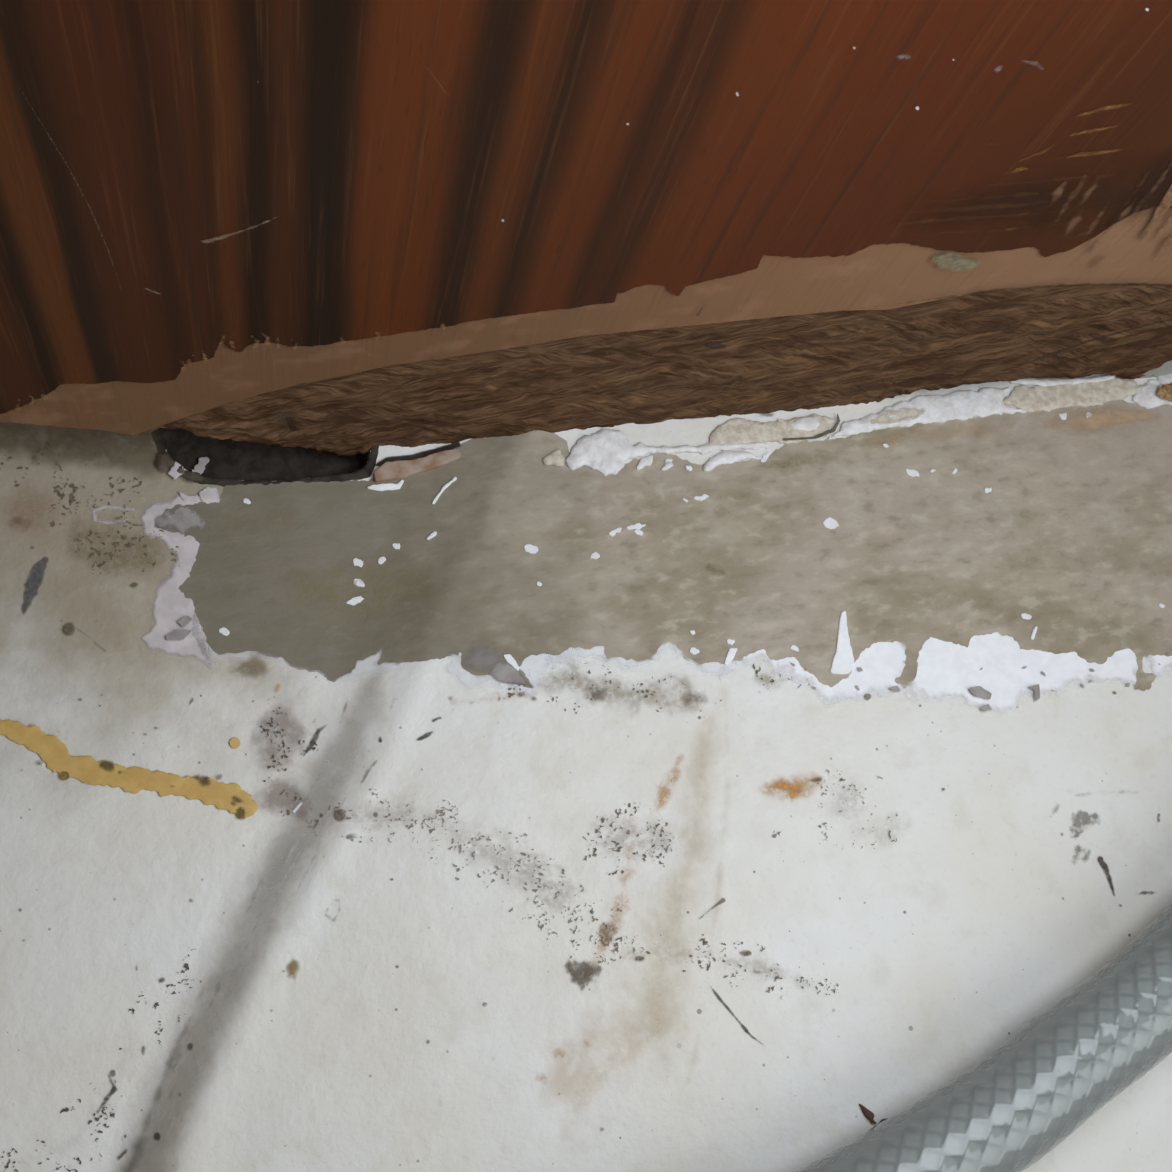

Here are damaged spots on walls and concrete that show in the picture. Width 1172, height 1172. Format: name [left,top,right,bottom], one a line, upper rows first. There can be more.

peeling [142,374,1172,711]
damp [548,662,619,714]
damp [369,789,595,946]
damp [582,802,678,877]
corrosion [768,778,821,798]
damp [814,769,882,849]
damp [683,934,783,999]